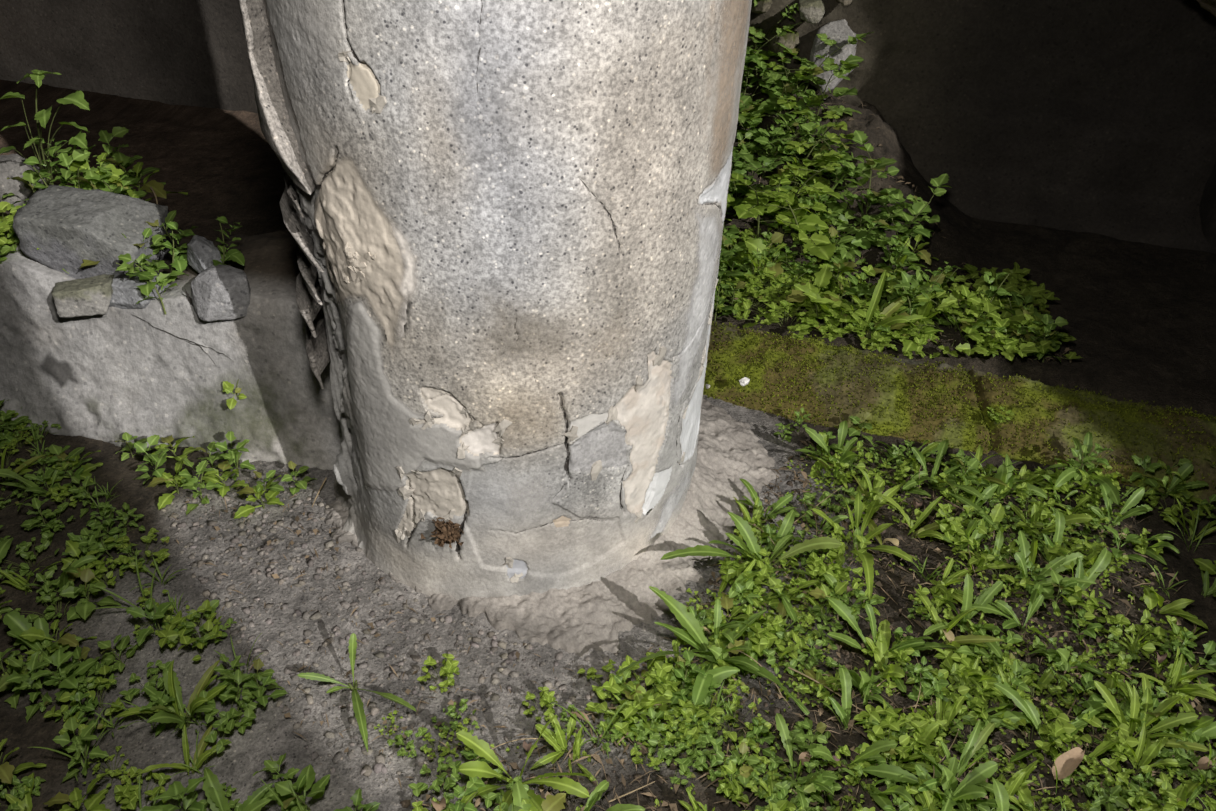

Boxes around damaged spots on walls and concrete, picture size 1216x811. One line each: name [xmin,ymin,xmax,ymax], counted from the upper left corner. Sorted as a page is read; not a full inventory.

peeling [238,0,405,389]
crack [580,179,620,248]
peeling [698,144,734,225]
spalling [564,249,721,523]
spalling [395,387,513,543]
spalling [503,557,528,583]